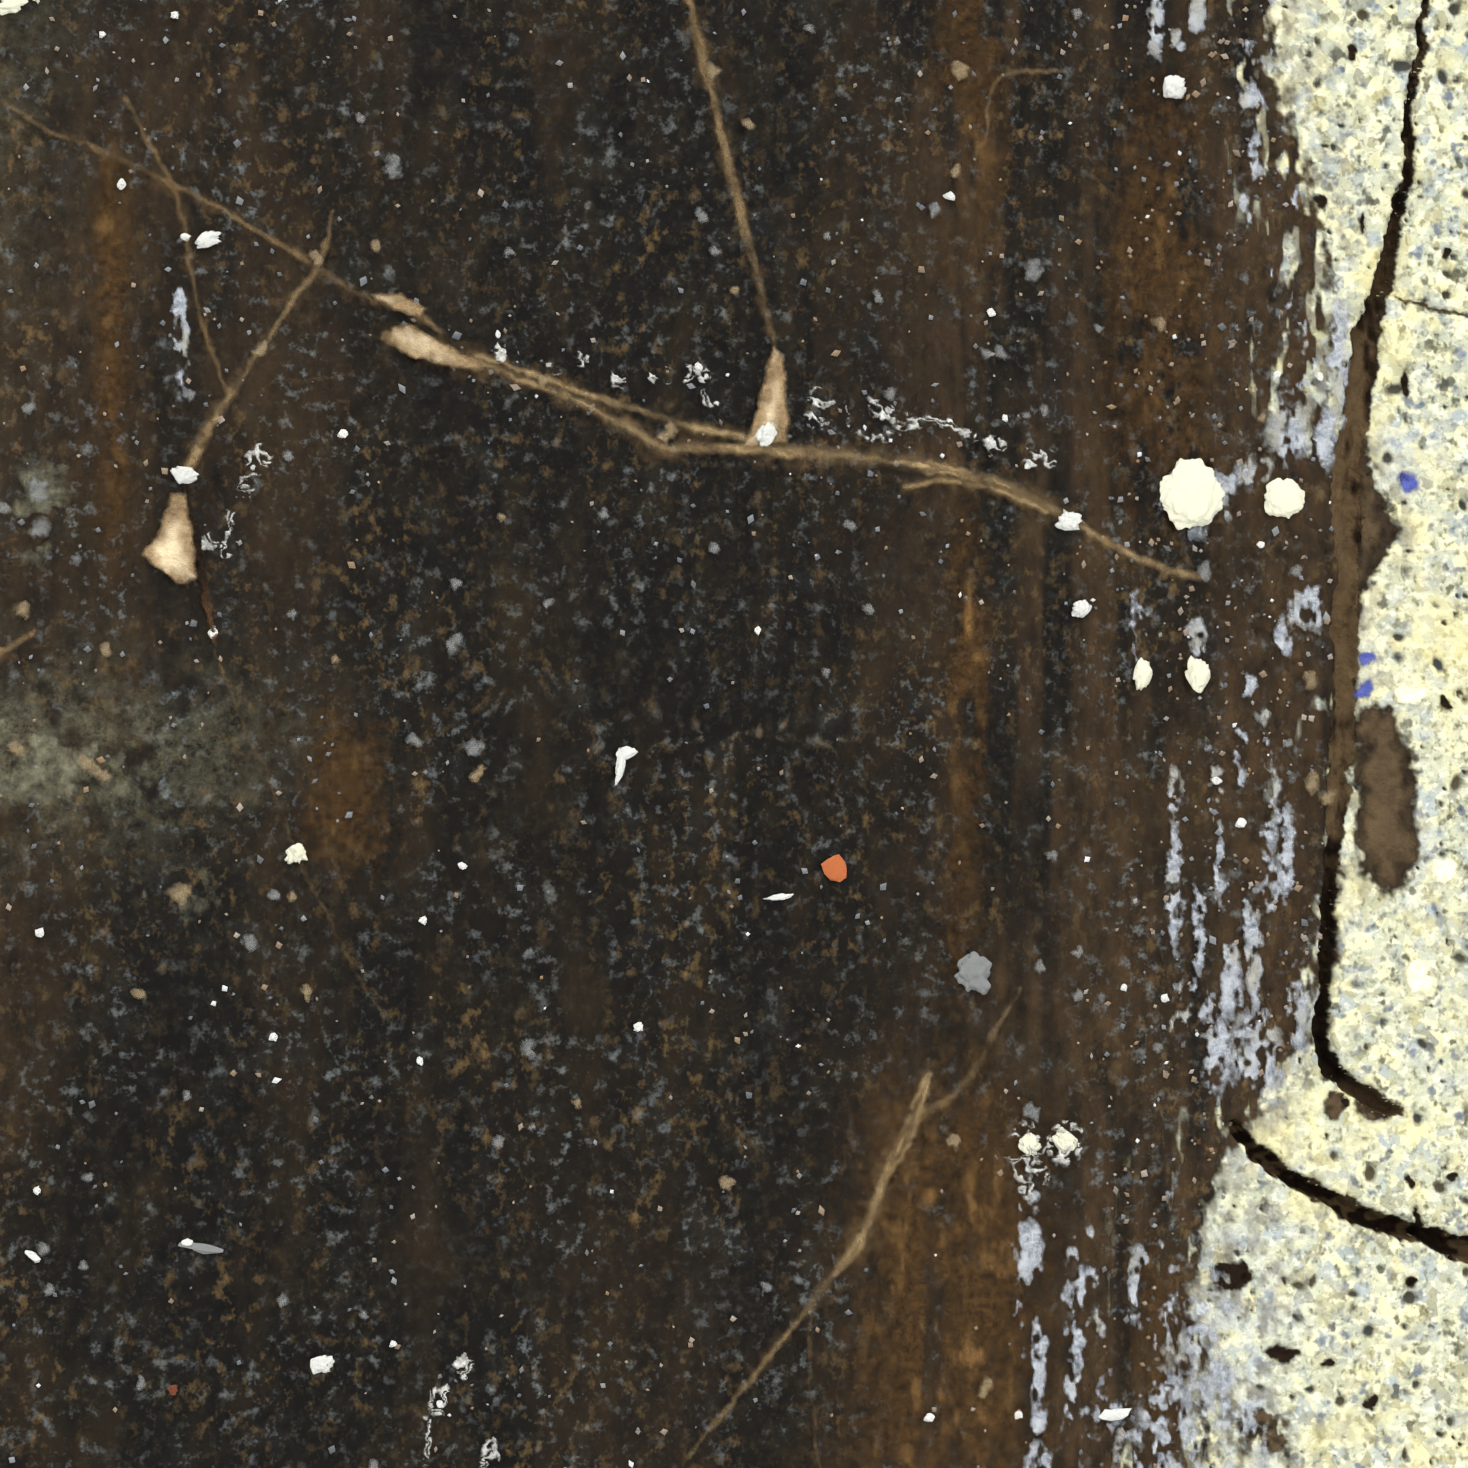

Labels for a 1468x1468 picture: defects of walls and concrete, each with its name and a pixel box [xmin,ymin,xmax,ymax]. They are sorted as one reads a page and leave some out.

crack [686,0,748,233]
damp [1321,240,1333,289]
crack [460,354,857,459]
damp [1314,295,1351,462]
crack [895,460,1053,514]
damp [1214,472,1237,505]
crack [1311,0,1468,1117]
spalling [1353,705,1421,895]
crack [832,1073,931,1276]
crack [1229,1119,1468,1264]
damp [1075,1267,1086,1305]
damp [1189,1324,1256,1432]